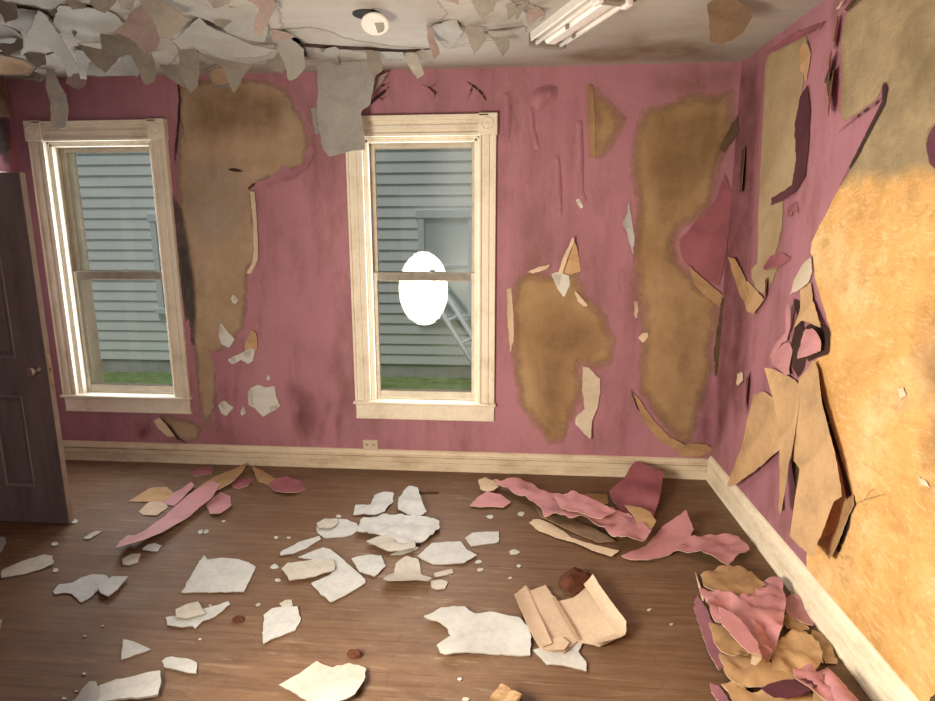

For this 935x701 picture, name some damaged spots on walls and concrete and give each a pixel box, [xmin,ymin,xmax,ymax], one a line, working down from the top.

peeling [707,0,753,44]
peeling [0,0,545,157]
spalling [551,272,570,297]
spalling [219,321,254,364]
spalling [218,375,280,417]